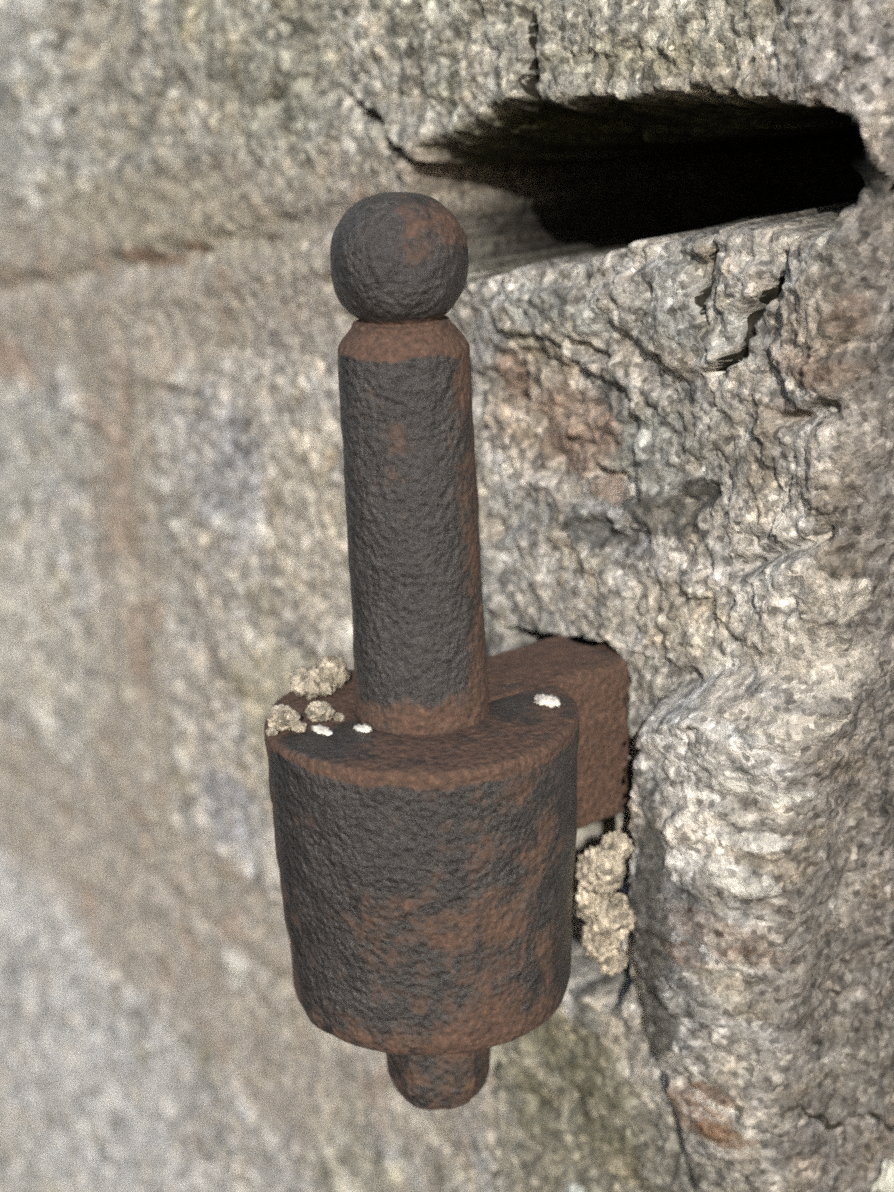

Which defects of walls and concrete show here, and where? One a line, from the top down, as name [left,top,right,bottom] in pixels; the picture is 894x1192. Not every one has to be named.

crack [518,0,542,97]
spalling [414,86,894,279]
crack [801,1105,894,1132]